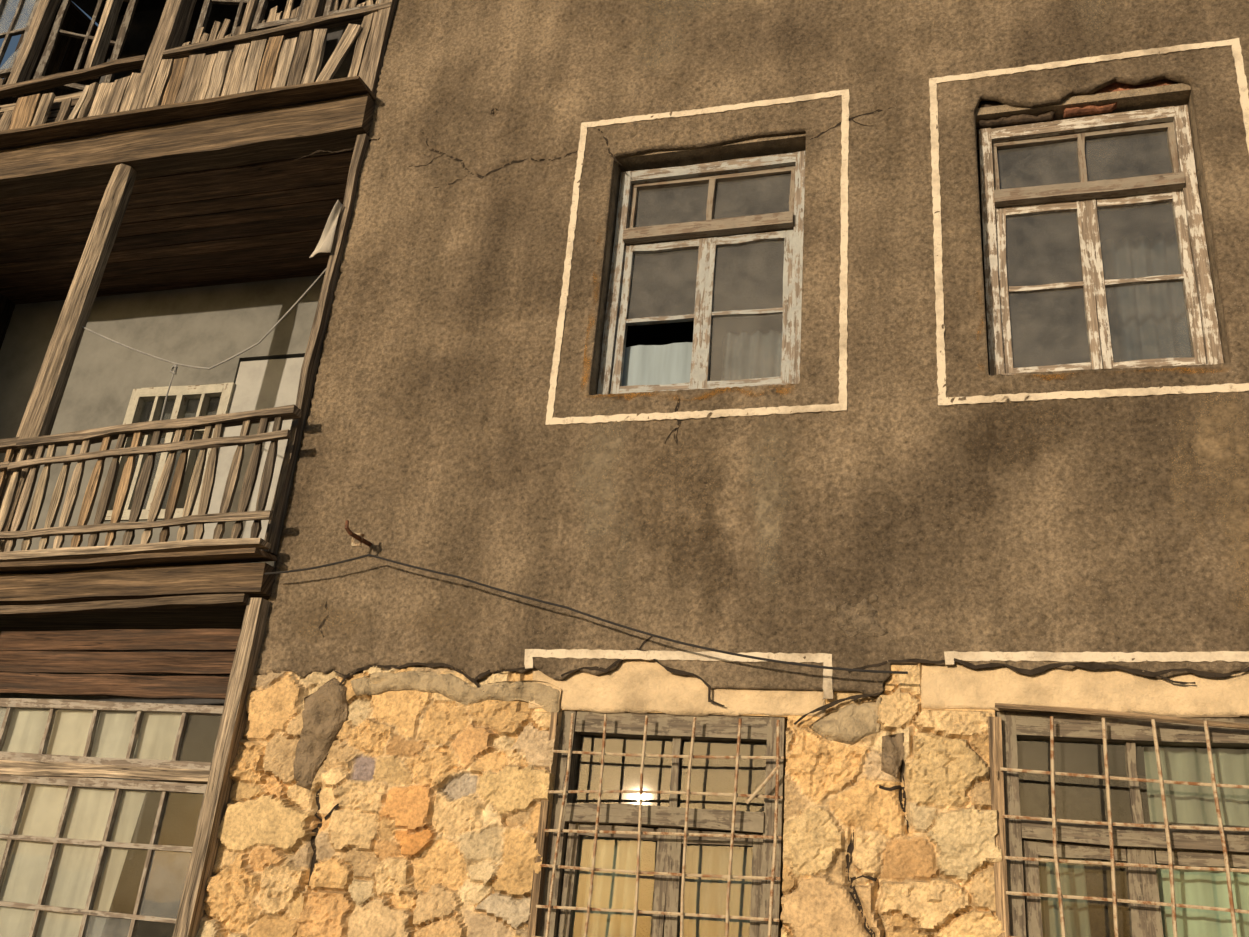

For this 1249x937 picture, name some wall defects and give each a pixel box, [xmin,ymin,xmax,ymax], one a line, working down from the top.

flaking render [976,79,1178,129]
crack [409,129,621,188]
flaking render [351,670,562,713]
crack [879,760,909,833]
crack [308,787,339,886]
crack [846,829,877,937]